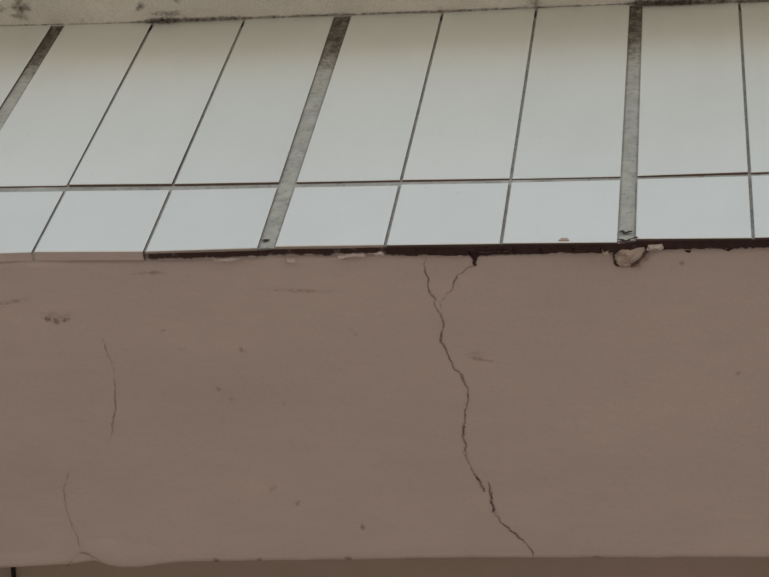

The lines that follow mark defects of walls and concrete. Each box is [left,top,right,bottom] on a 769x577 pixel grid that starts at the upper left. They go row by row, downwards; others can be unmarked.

spalling [602,230,664,268]
crack [474,474,523,540]